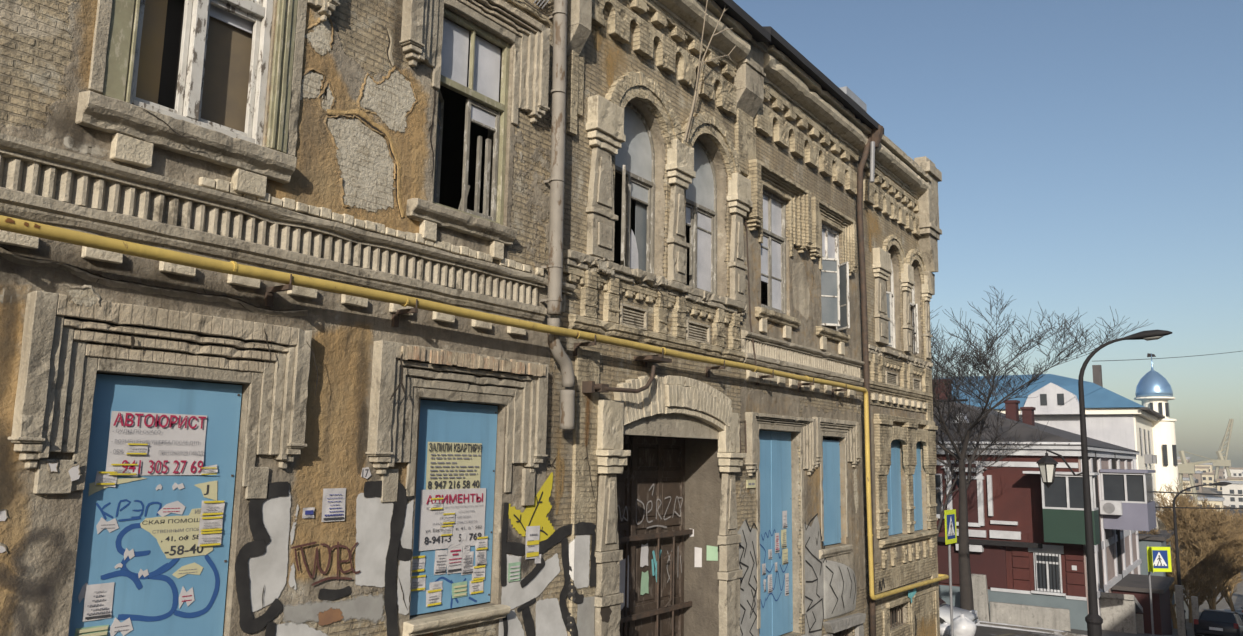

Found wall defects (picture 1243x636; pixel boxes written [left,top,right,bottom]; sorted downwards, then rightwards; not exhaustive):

flaking render [305,17,334,56]
flaking render [300,65,418,213]
flaking render [318,608,344,626]